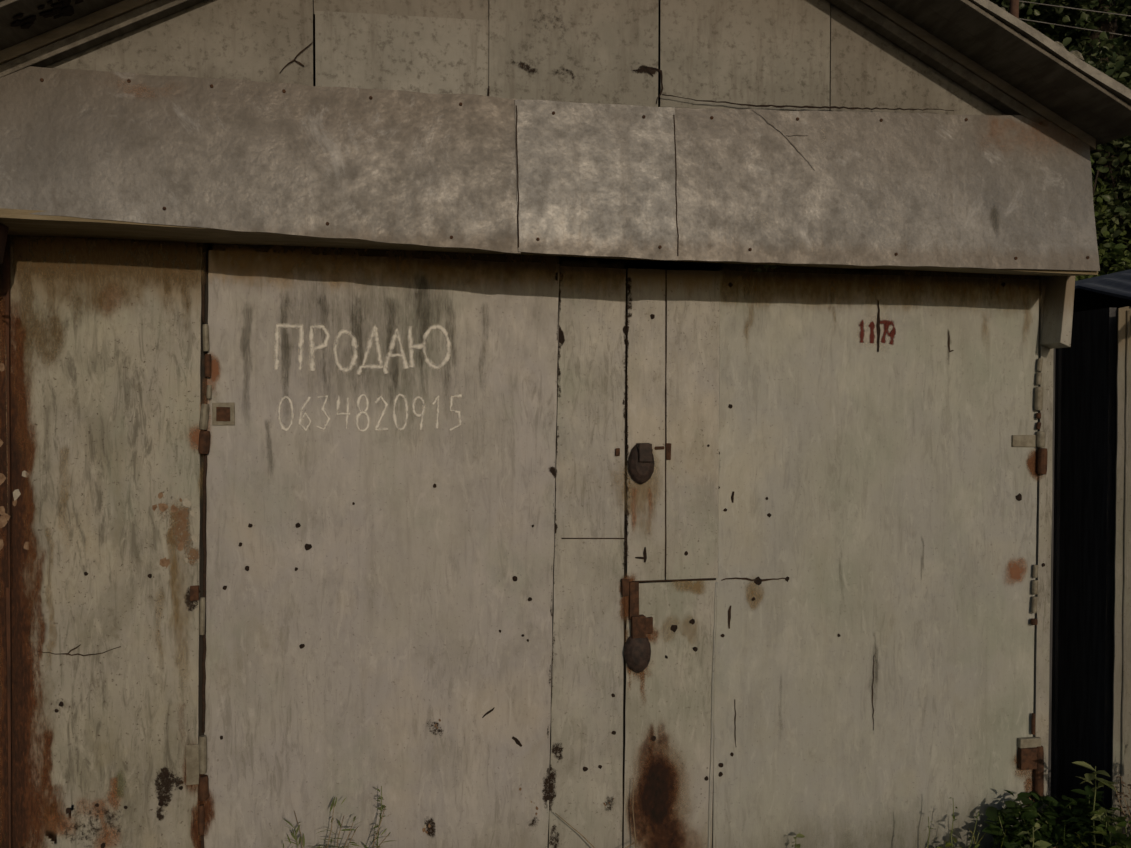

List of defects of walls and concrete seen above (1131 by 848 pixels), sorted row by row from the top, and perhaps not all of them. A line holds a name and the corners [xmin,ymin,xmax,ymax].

corrosion [1027,450,1042,478]
corrosion [0,297,120,848]
corrosion [1008,559,1026,581]
corrosion [629,728,689,848]